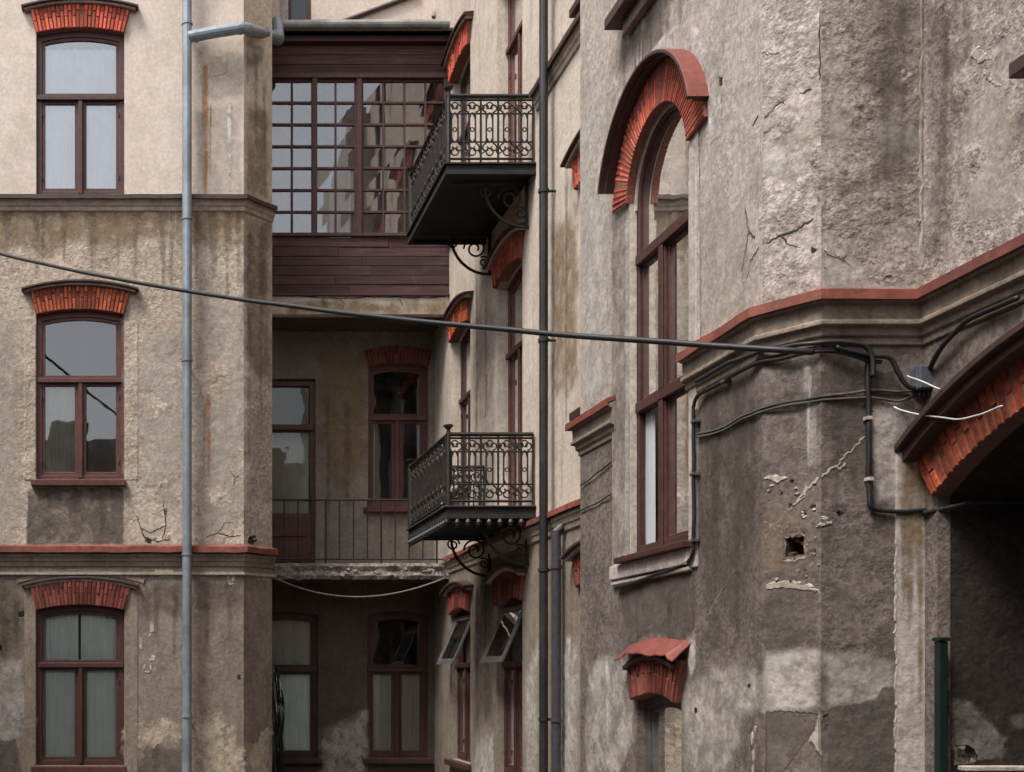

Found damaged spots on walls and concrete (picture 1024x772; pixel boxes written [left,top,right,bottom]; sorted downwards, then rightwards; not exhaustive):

rust [203,66,211,126]
crack [741,13,821,300]
leakage [0,212,270,375]
crack [136,502,169,542]
flaking render [764,475,833,594]
crack [764,436,865,540]
flaking render [684,650,892,772]